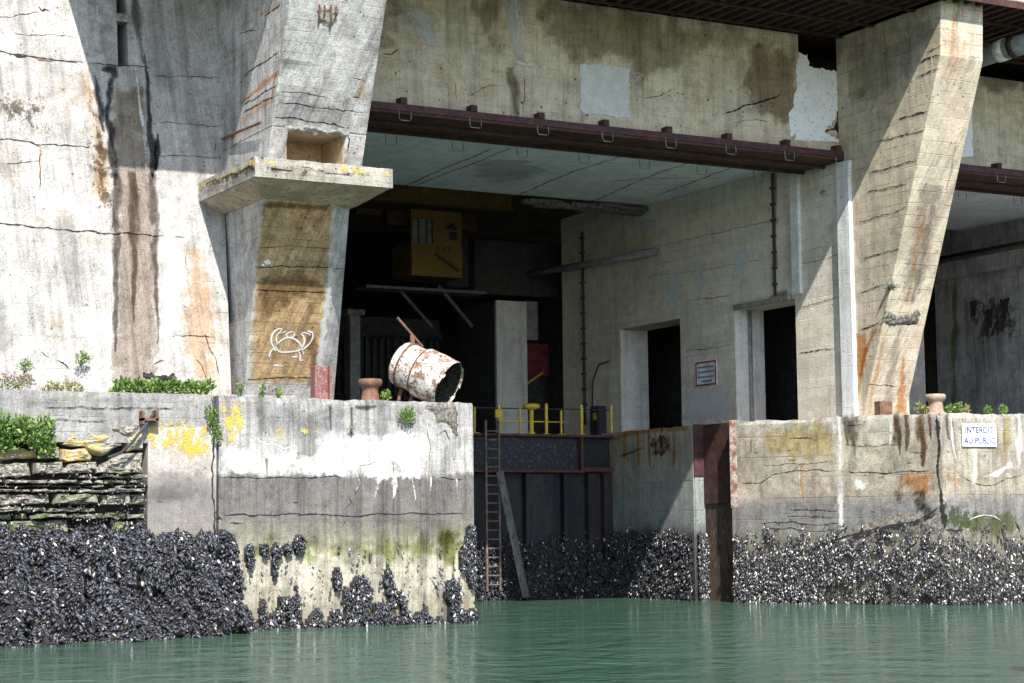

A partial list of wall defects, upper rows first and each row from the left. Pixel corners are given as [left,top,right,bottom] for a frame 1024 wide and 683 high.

water stain [89,66,119,207]
water stain [135,56,160,177]
crack [238,51,362,127]
crack [726,94,780,123]
peeling [788,52,839,143]
crack [0,209,187,262]
water stain [85,236,117,378]
peeling [969,297,1016,336]
water stain [218,429,436,500]
rust [650,435,670,456]
crack [745,417,1020,533]
rust [889,413,931,466]